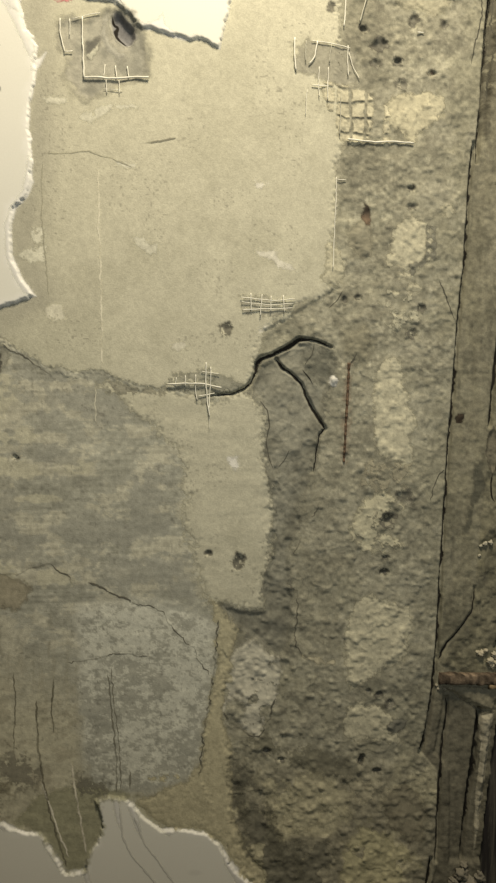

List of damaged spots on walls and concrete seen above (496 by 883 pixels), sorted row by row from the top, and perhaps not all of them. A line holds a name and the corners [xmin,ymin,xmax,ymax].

peeling [0,0,359,883]
crack [211,338,328,471]
rust [343,363,351,462]
crack [419,0,496,883]
crack [51,564,189,645]
crack [202,621,229,719]
water stain [250,732,355,783]
water stain [233,762,334,883]